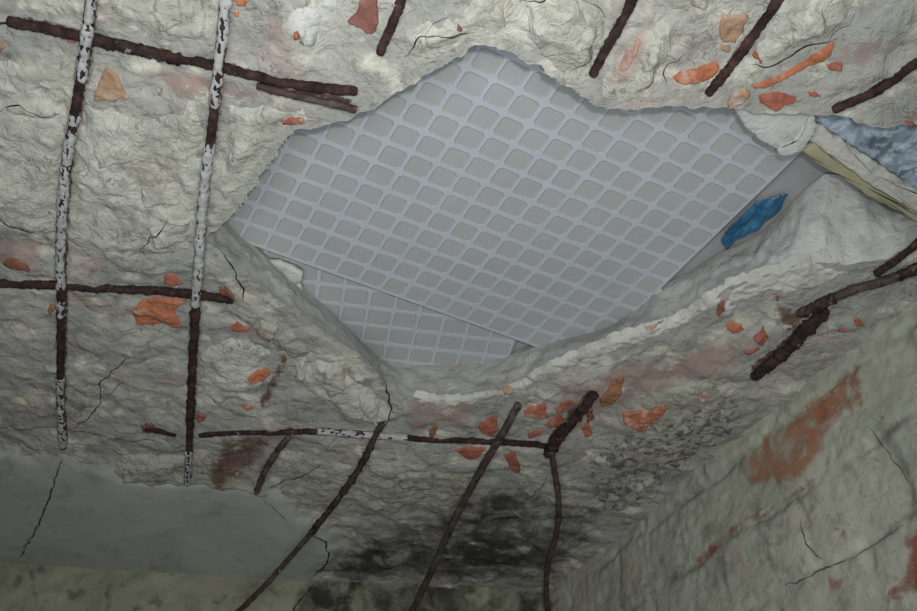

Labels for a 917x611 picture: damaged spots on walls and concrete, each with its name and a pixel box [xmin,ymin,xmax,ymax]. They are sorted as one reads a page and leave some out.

spalling [404,0,672,110]
spalling [705,0,854,97]
peeling [680,58,917,156]
spalling [0,0,599,611]
spalling [204,174,917,410]
corrosion [780,307,799,330]
crack [19,458,63,559]
corrosion [212,439,267,488]
corrosion [261,368,282,406]
leakage [302,586,333,607]
leakage [345,494,584,611]
peeling [749,380,860,482]